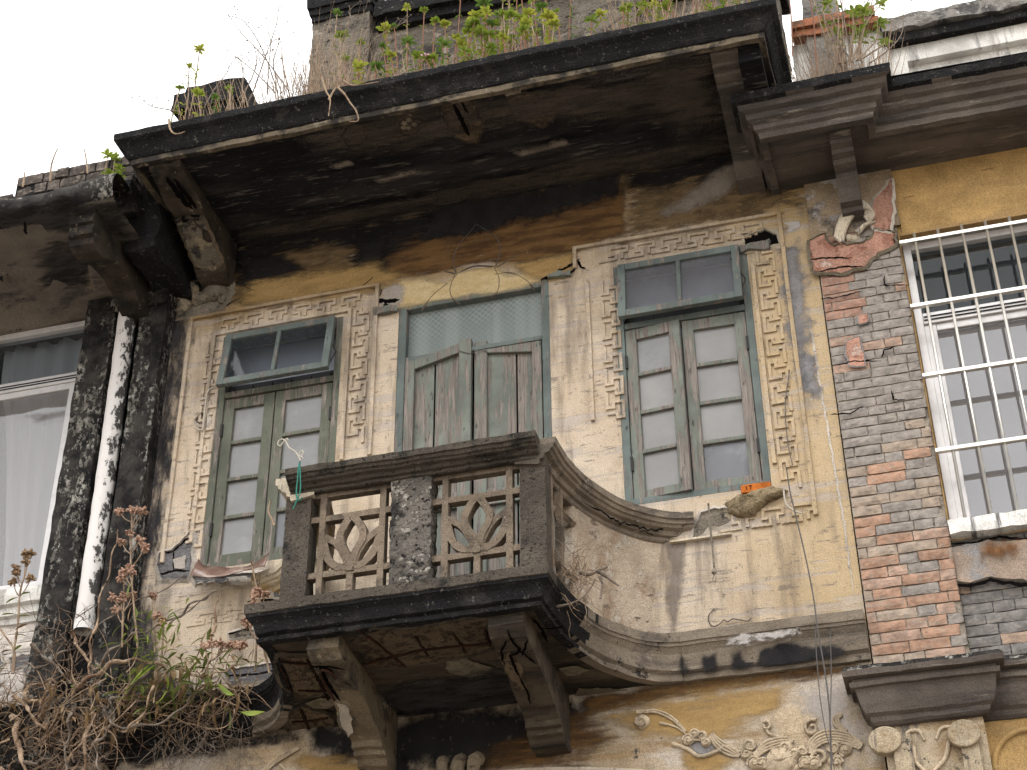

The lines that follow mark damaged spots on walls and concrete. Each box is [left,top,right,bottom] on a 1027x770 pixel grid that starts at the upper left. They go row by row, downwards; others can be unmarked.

leakage [229,55,802,312]
spalling [806,178,898,276]
crack [585,503,663,535]
spalling [155,530,264,588]
peeling [948,539,1027,588]
spalling [227,627,255,641]
crack [310,665,345,702]
crack [500,618,563,704]
leakage [483,643,856,768]